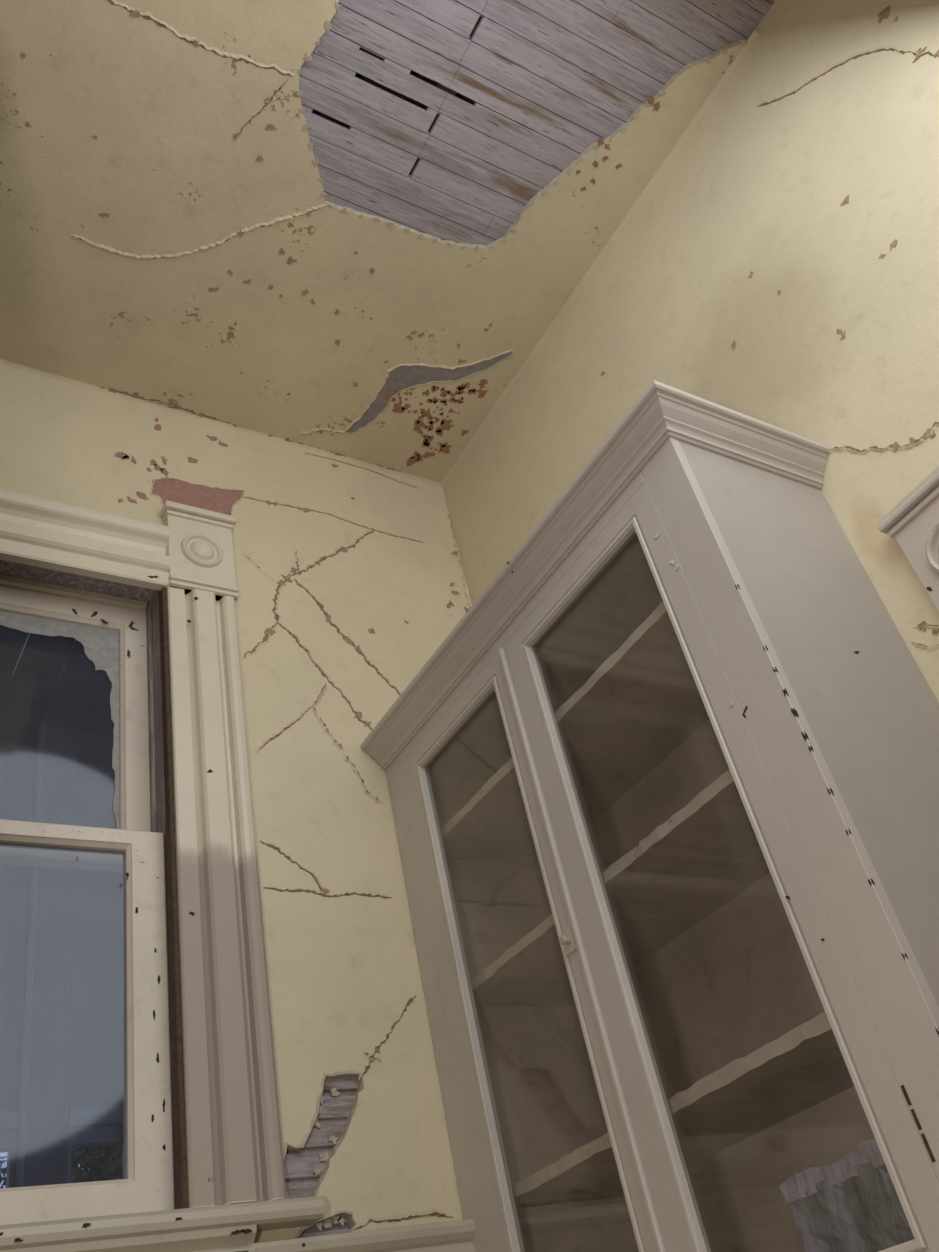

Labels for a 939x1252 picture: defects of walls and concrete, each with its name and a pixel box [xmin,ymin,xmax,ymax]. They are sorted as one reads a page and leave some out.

crack [108,0,295,140]
flaking render [296,0,775,251]
crack [757,45,939,107]
peeling [115,452,245,516]
peeling [298,344,514,466]
crack [829,422,939,456]
crack [243,496,471,804]
crack [260,840,392,899]
crack [358,994,416,1080]
flaking render [283,1071,364,1199]